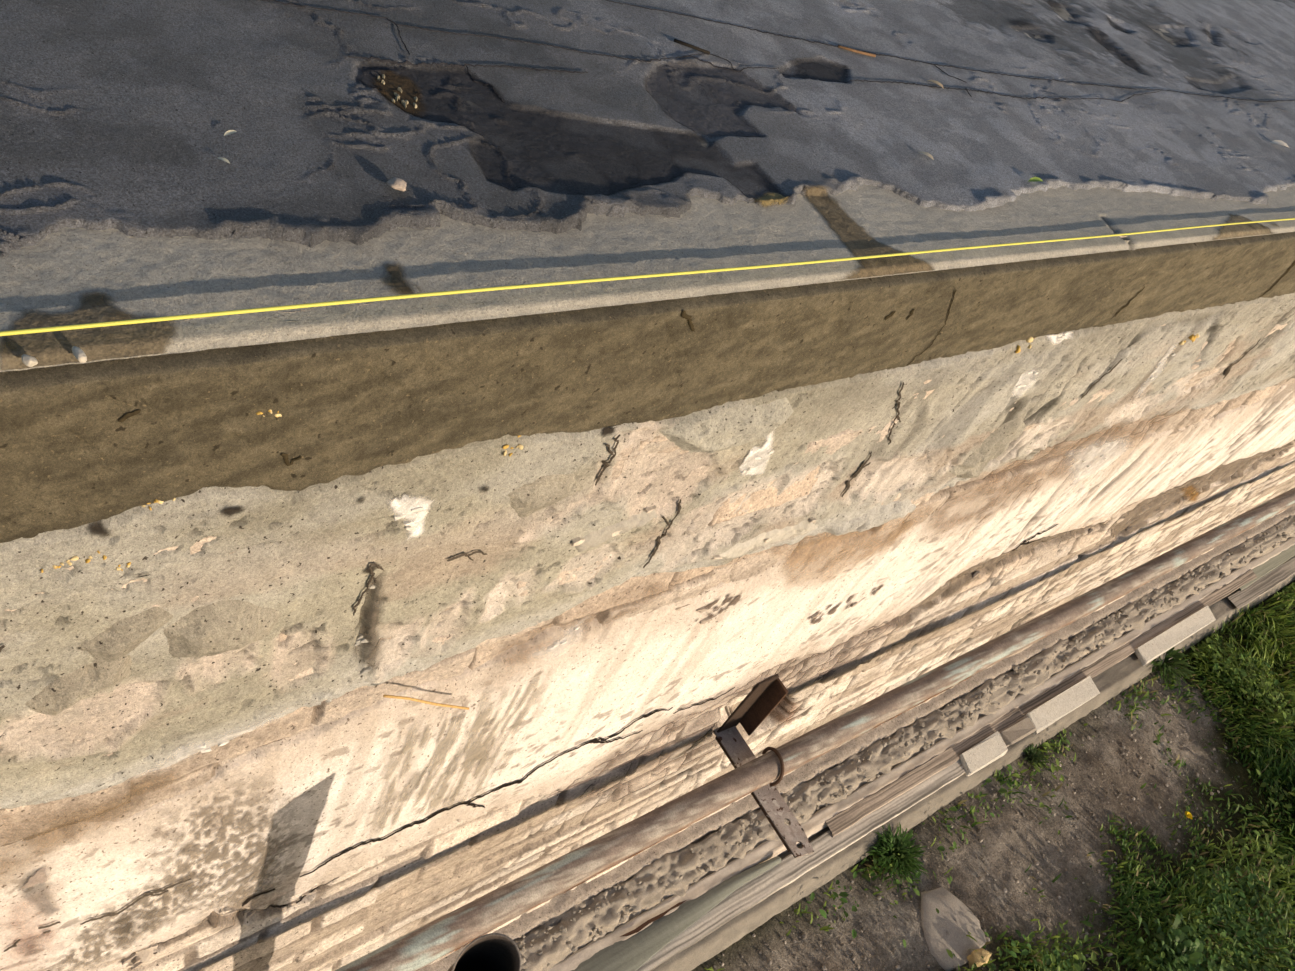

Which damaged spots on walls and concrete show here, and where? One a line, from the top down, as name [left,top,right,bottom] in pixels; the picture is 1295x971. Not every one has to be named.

peeling [377,74,418,108]
crack [258,0,779,103]
crack [606,0,1295,102]
water stain [806,186,934,280]
water stain [0,293,175,371]
crack [242,687,735,908]